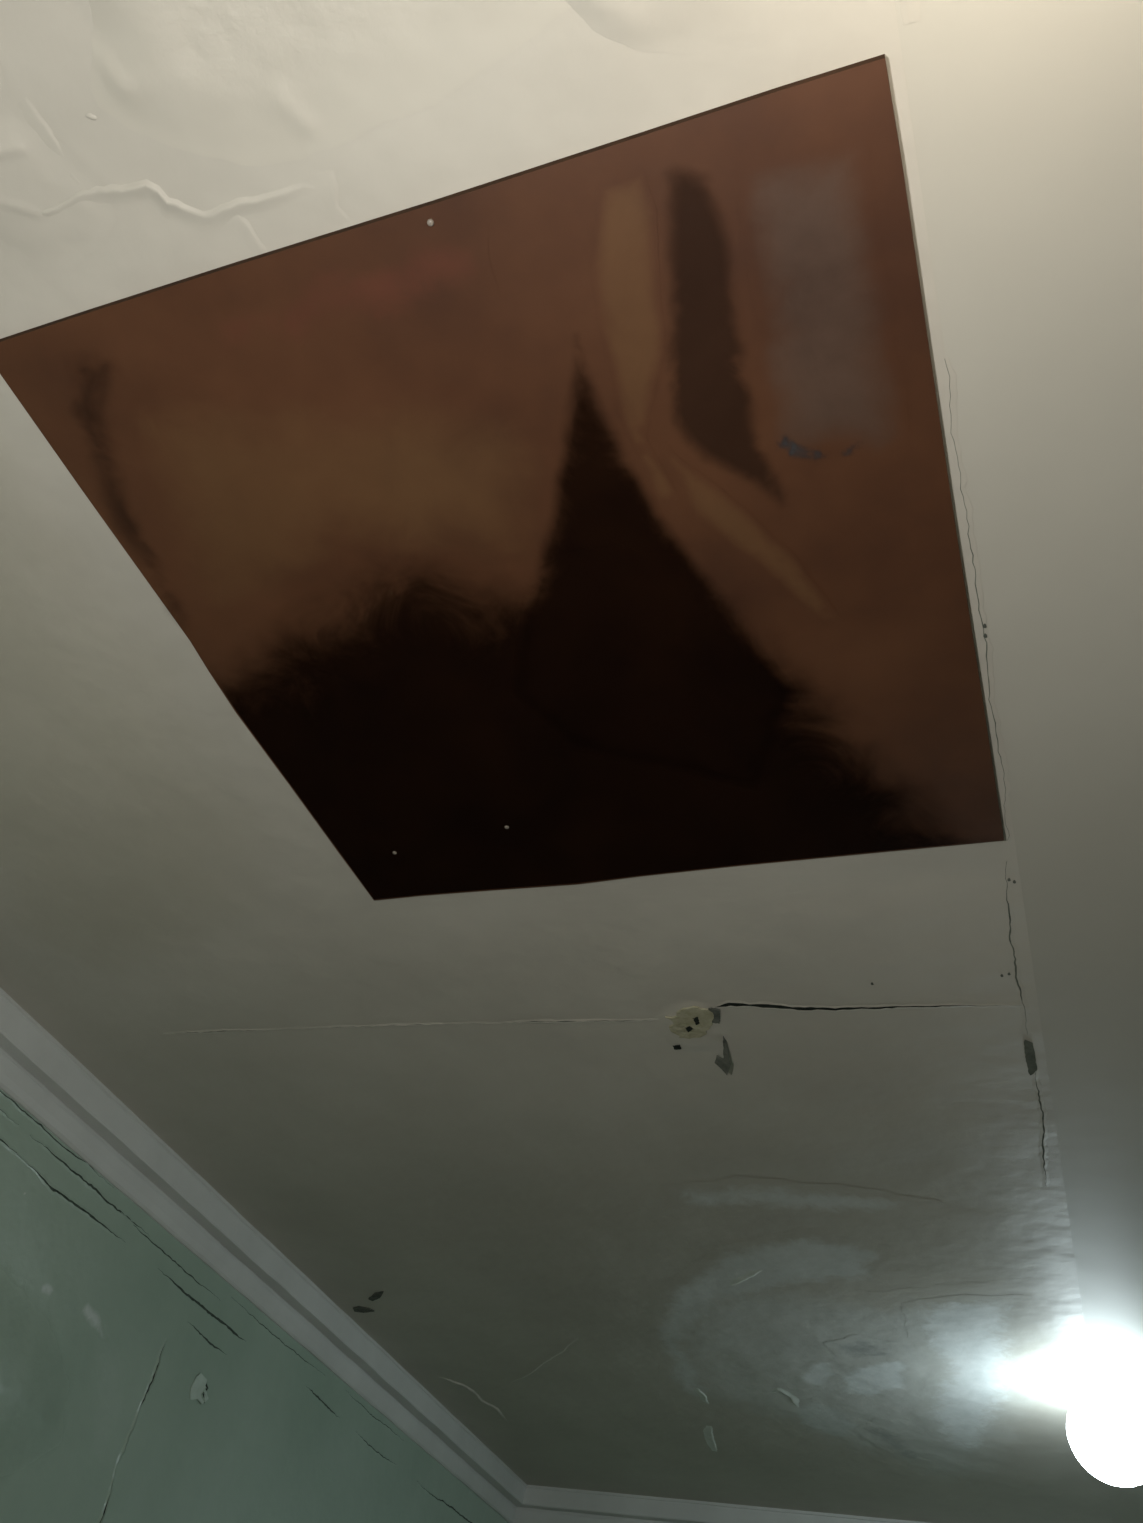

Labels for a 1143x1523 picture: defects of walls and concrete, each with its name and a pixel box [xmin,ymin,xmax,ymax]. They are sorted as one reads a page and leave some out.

peeling [41,170,351,261]
crack [714,357,1050,1187]
crack [162,1018,659,1035]
crack [0,1089,474,1523]